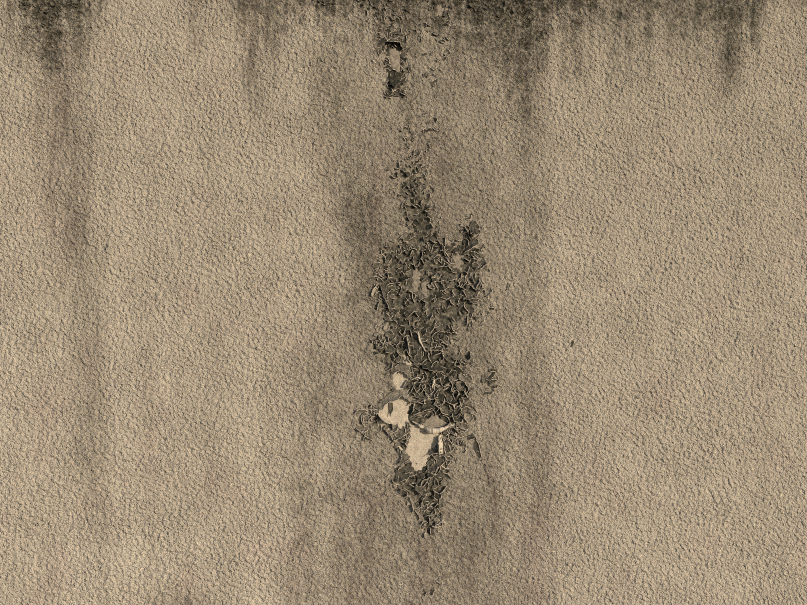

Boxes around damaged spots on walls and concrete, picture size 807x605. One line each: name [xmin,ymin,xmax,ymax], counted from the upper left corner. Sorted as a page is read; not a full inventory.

peeling [358,0,527,98]
peeling [354,112,501,539]